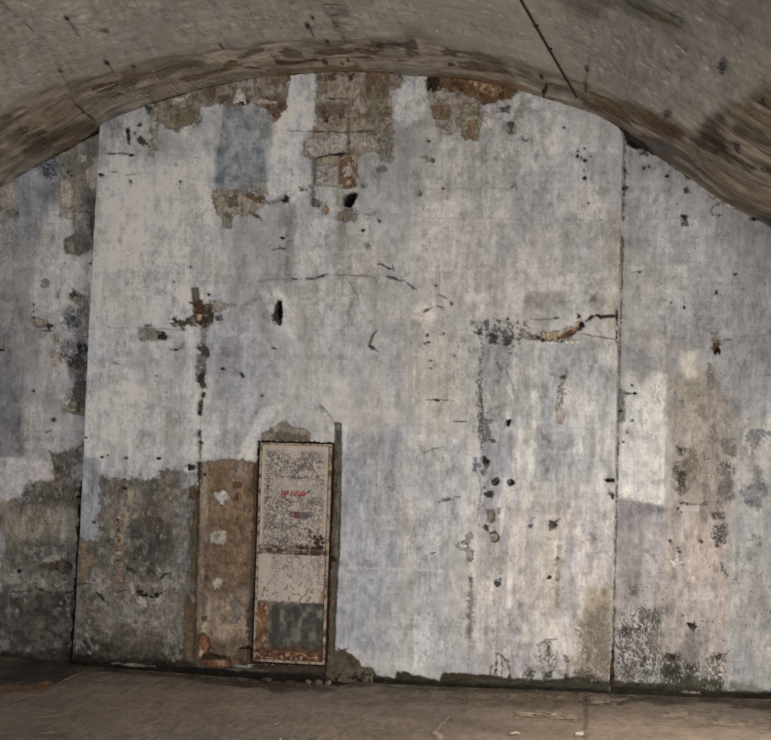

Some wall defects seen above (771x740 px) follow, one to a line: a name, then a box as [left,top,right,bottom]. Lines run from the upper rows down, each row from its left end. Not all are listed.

peeling [59,133,99,256]
peeling [106,75,291,156]
peeling [211,181,289,229]
peeling [299,70,404,207]
peeling [426,75,522,141]
spalling [138,287,236,412]
crack [578,136,678,685]
peeling [0,441,259,668]
crack [575,694,588,738]